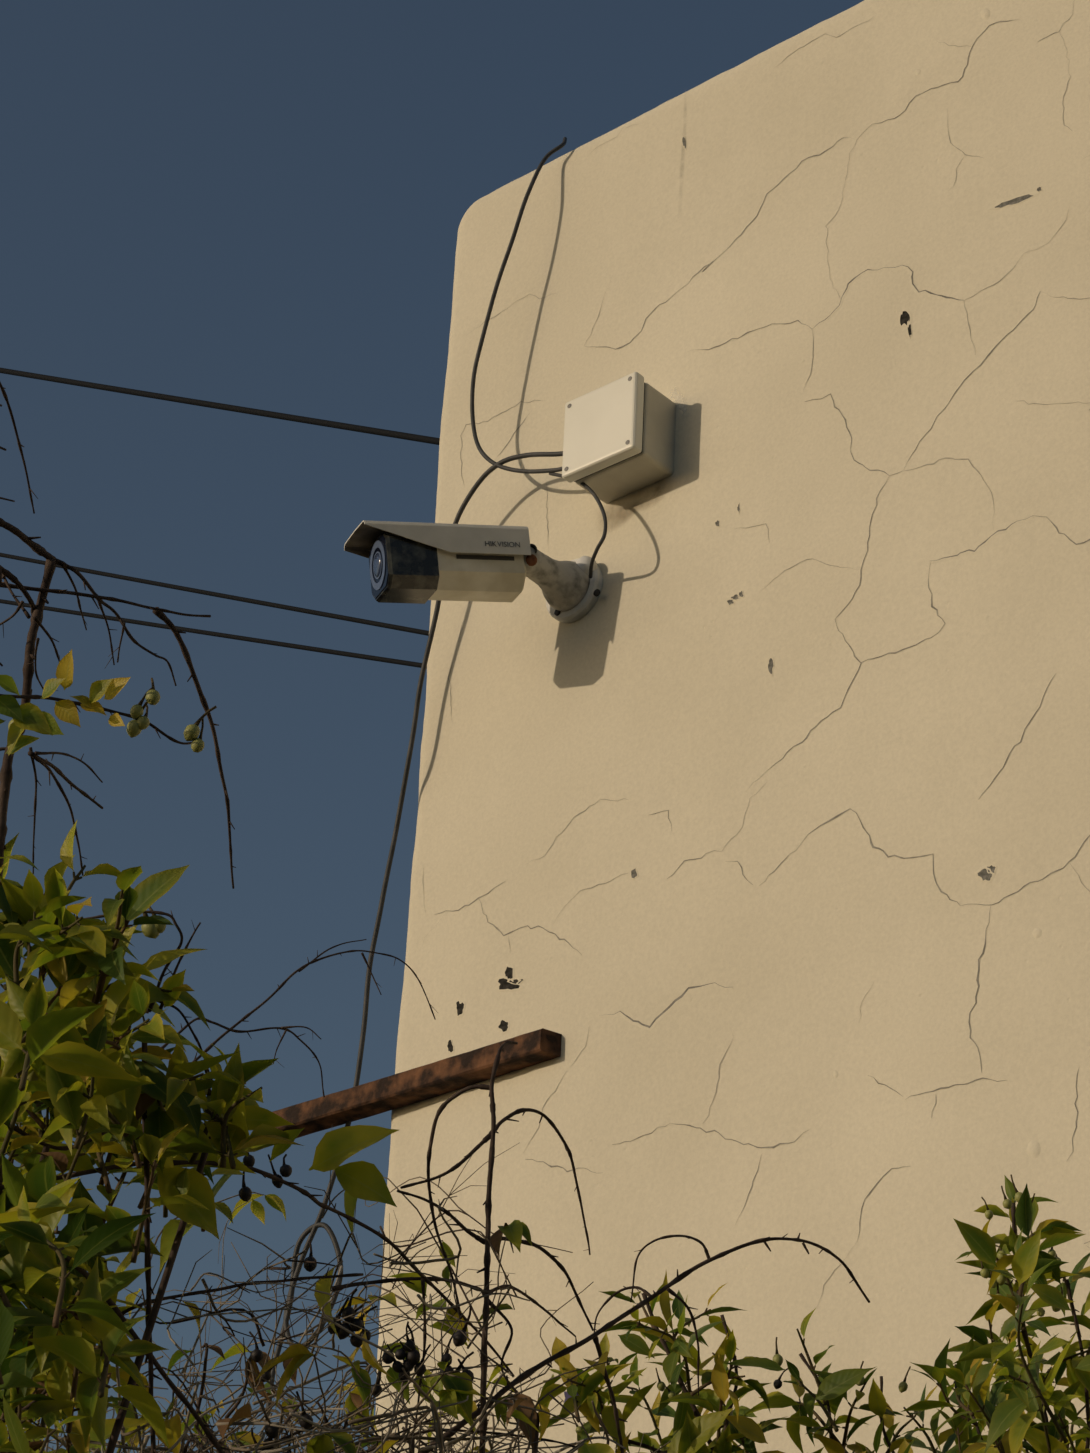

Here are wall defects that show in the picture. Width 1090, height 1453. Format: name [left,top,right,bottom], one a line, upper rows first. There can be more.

spalling [987,186,1043,211]
spalling [899,308,913,339]
crack [460,400,546,483]
crack [586,14,1090,1118]
crack [422,868,627,952]
flaking render [974,864,998,883]
spalling [455,998,466,1019]
spalling [497,1018,510,1034]
spalling [494,964,526,992]
crack [525,982,808,1220]
crack [1068,1069,1079,1159]
crack [818,1166,911,1304]